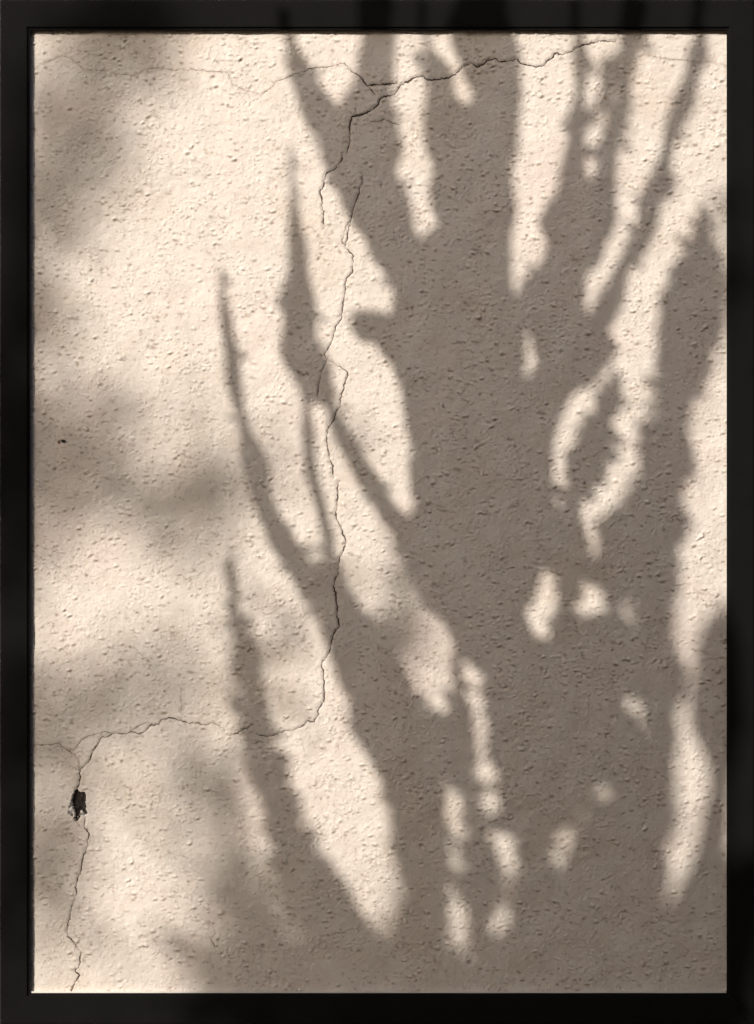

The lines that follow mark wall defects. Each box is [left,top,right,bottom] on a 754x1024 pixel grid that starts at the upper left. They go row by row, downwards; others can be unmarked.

crack [37,40,615,788]
hole [67,789,87,821]
crack [67,818,91,991]